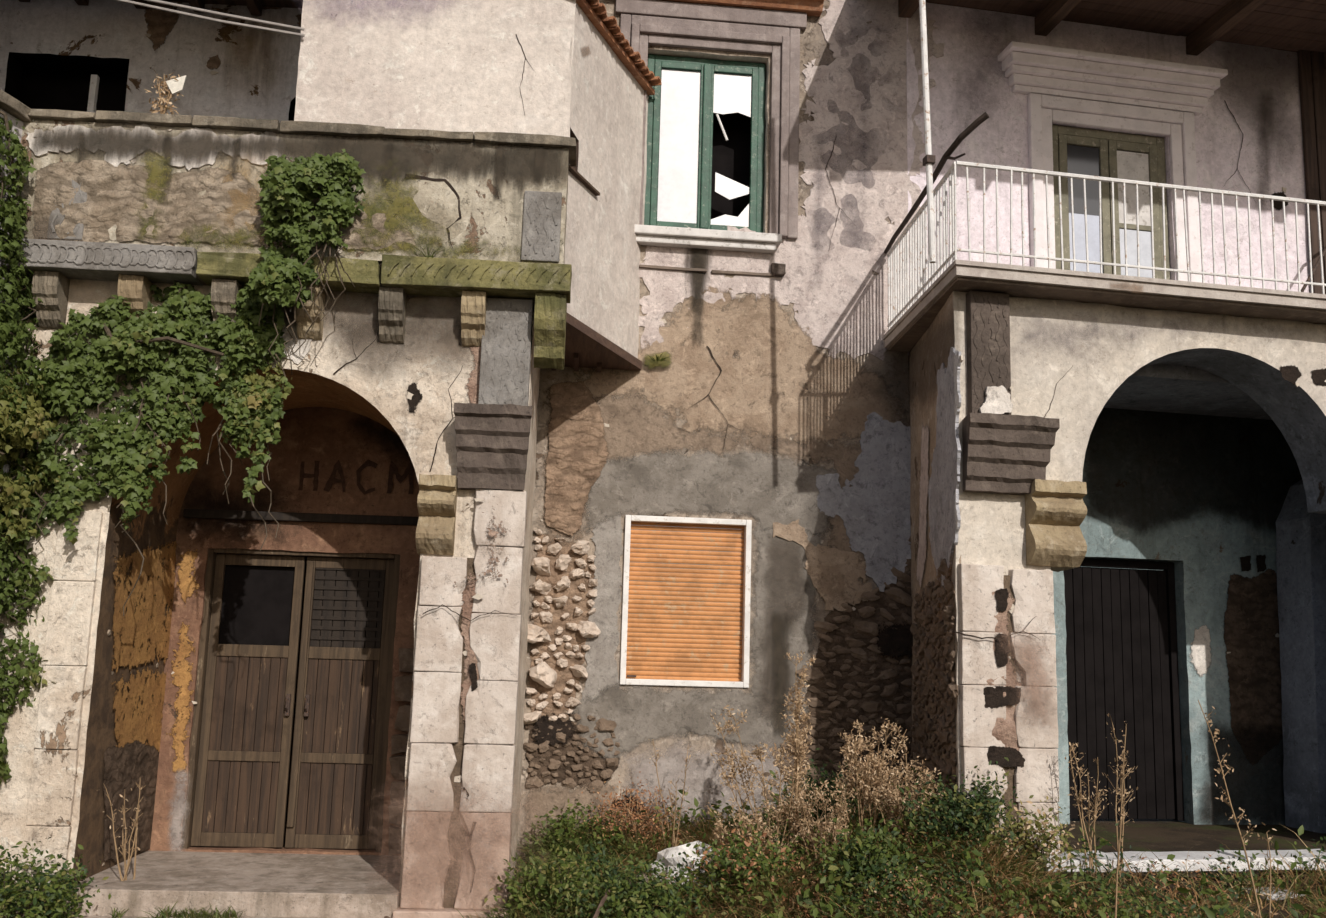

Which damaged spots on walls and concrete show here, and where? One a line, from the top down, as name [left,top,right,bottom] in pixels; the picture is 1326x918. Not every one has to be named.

flaking render [144,1,179,51]
crack [391,174,462,248]
leakage [686,248,709,339]
crack [1223,100,1256,202]
crack [688,346,746,449]
peeling [102,541,201,866]
spalling [454,498,511,723]
flaking render [521,286,907,851]
flaking render [761,515,959,814]
spalling [983,588,1025,768]
peeling [1190,555,1285,825]
crack [469,822,477,893]